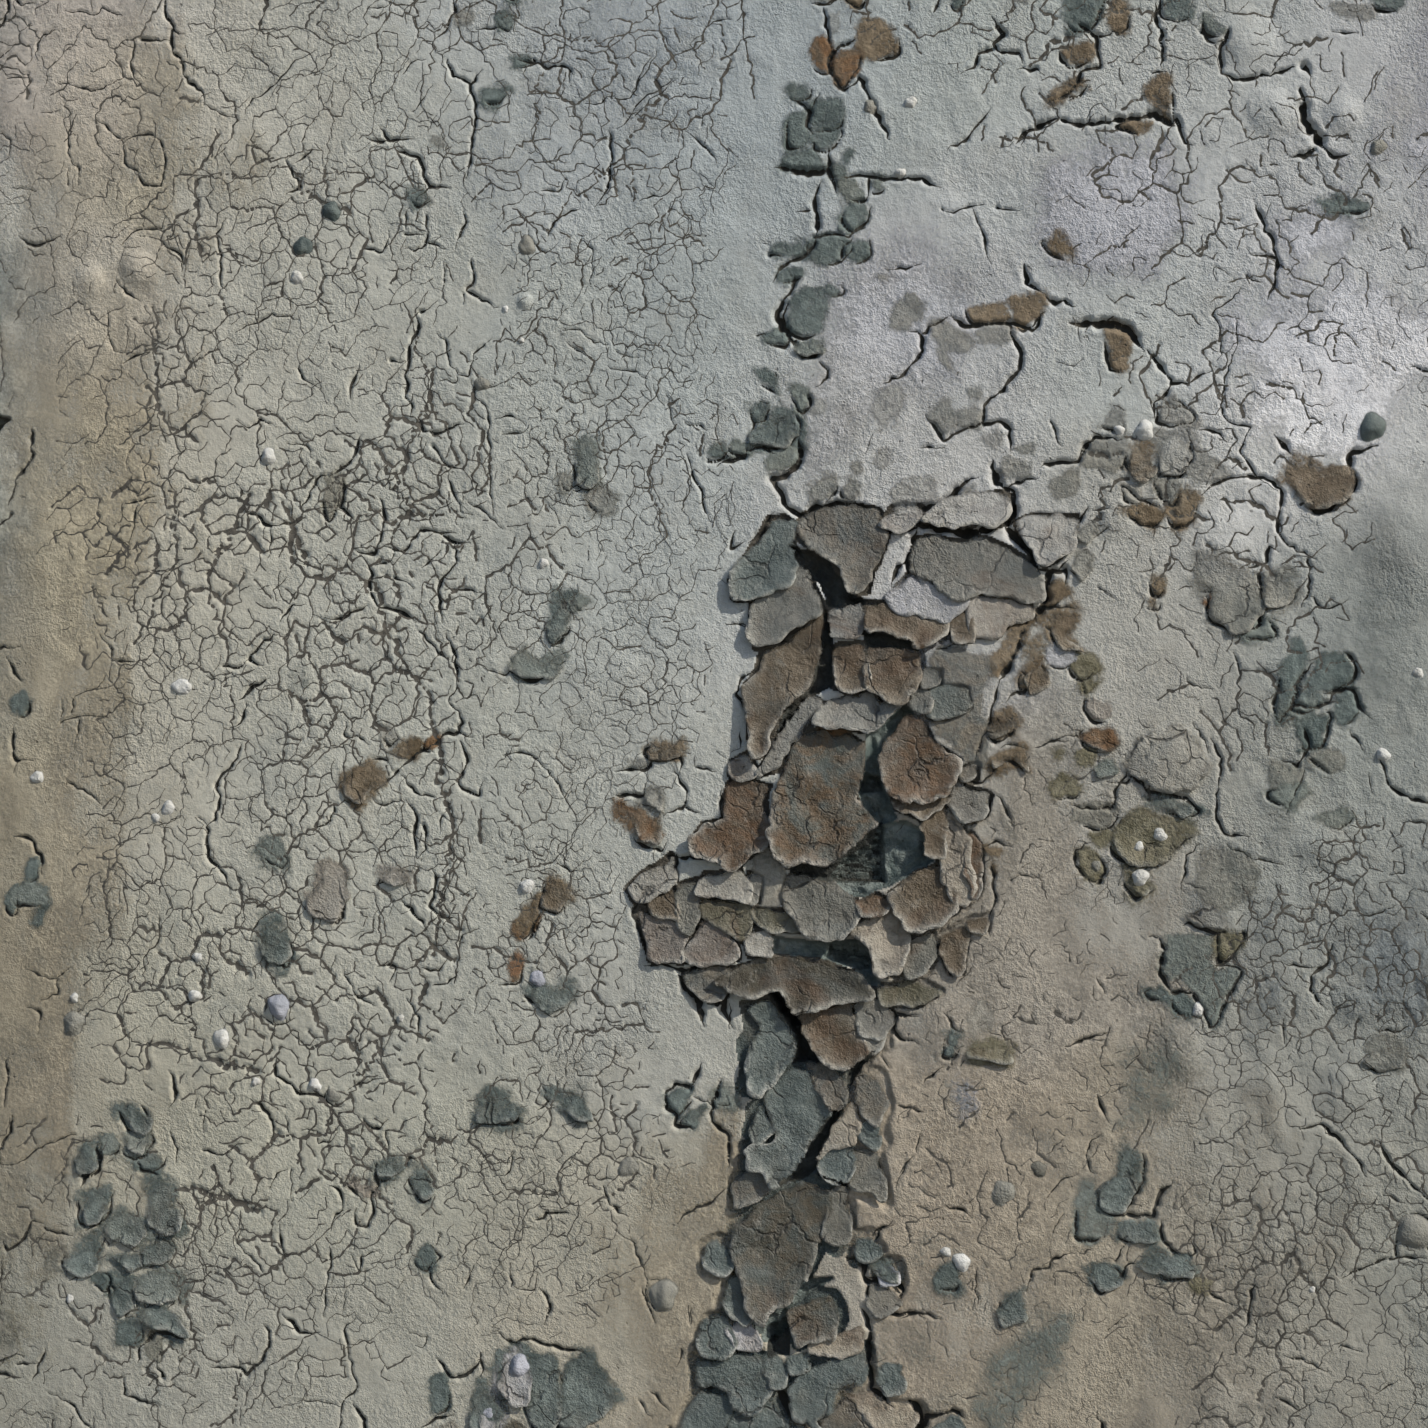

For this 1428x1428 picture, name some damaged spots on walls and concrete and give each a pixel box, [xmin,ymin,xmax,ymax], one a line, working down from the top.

peeling [762,0,901,360]
peeling [1046,0,1131,107]
peeling [706,367,826,471]
peeling [889,291,1049,371]
peeling [1104,318,1134,373]
crack [0,0,870,1428]
peeling [507,588,590,684]
crack [756,0,1428,1428]
peeling [1191,546,1367,829]
peeling [612,384,1261,1428]
peeling [45,1102,192,1363]
peeling [428,1342,624,1428]